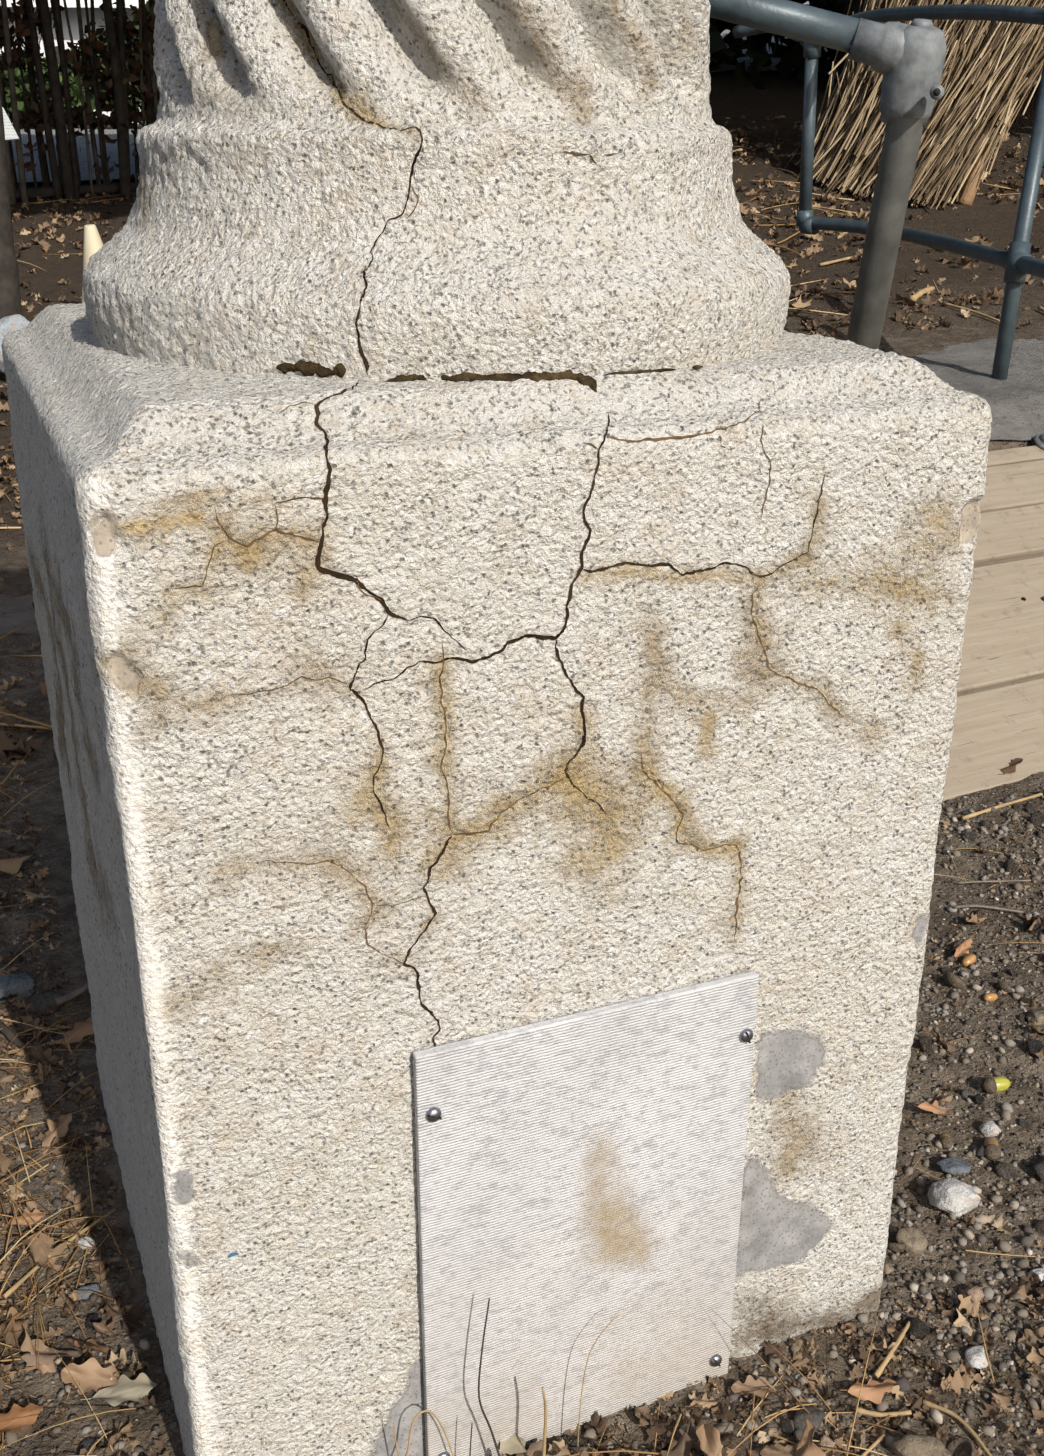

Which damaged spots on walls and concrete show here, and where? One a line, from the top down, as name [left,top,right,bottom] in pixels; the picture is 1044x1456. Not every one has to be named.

spalling [90,513,116,557]
crack [175,0,844,1047]
damp [747,585,843,717]